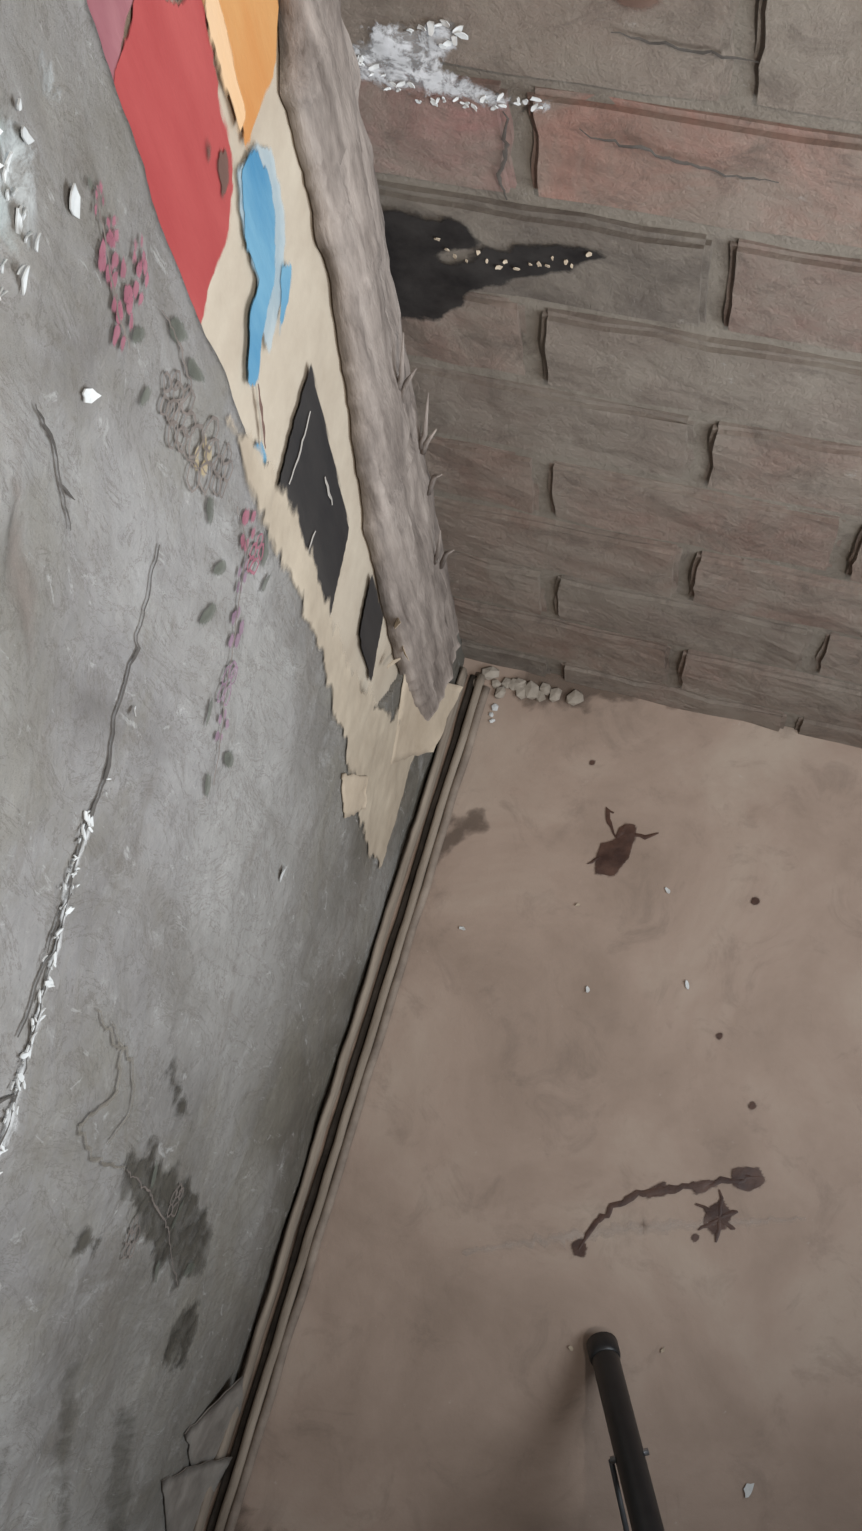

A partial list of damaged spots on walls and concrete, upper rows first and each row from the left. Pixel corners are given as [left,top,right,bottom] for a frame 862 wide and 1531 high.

crack [579,128,779,183]
peeling [0,98,41,301]
peeling [434,238,592,271]
crack [0,544,160,1174]
leakage [587,807,659,876]
leakage [79,1009,213,1289]
leakage [74,1228,102,1253]
leakage [572,1167,765,1257]
leakage [165,1301,199,1371]